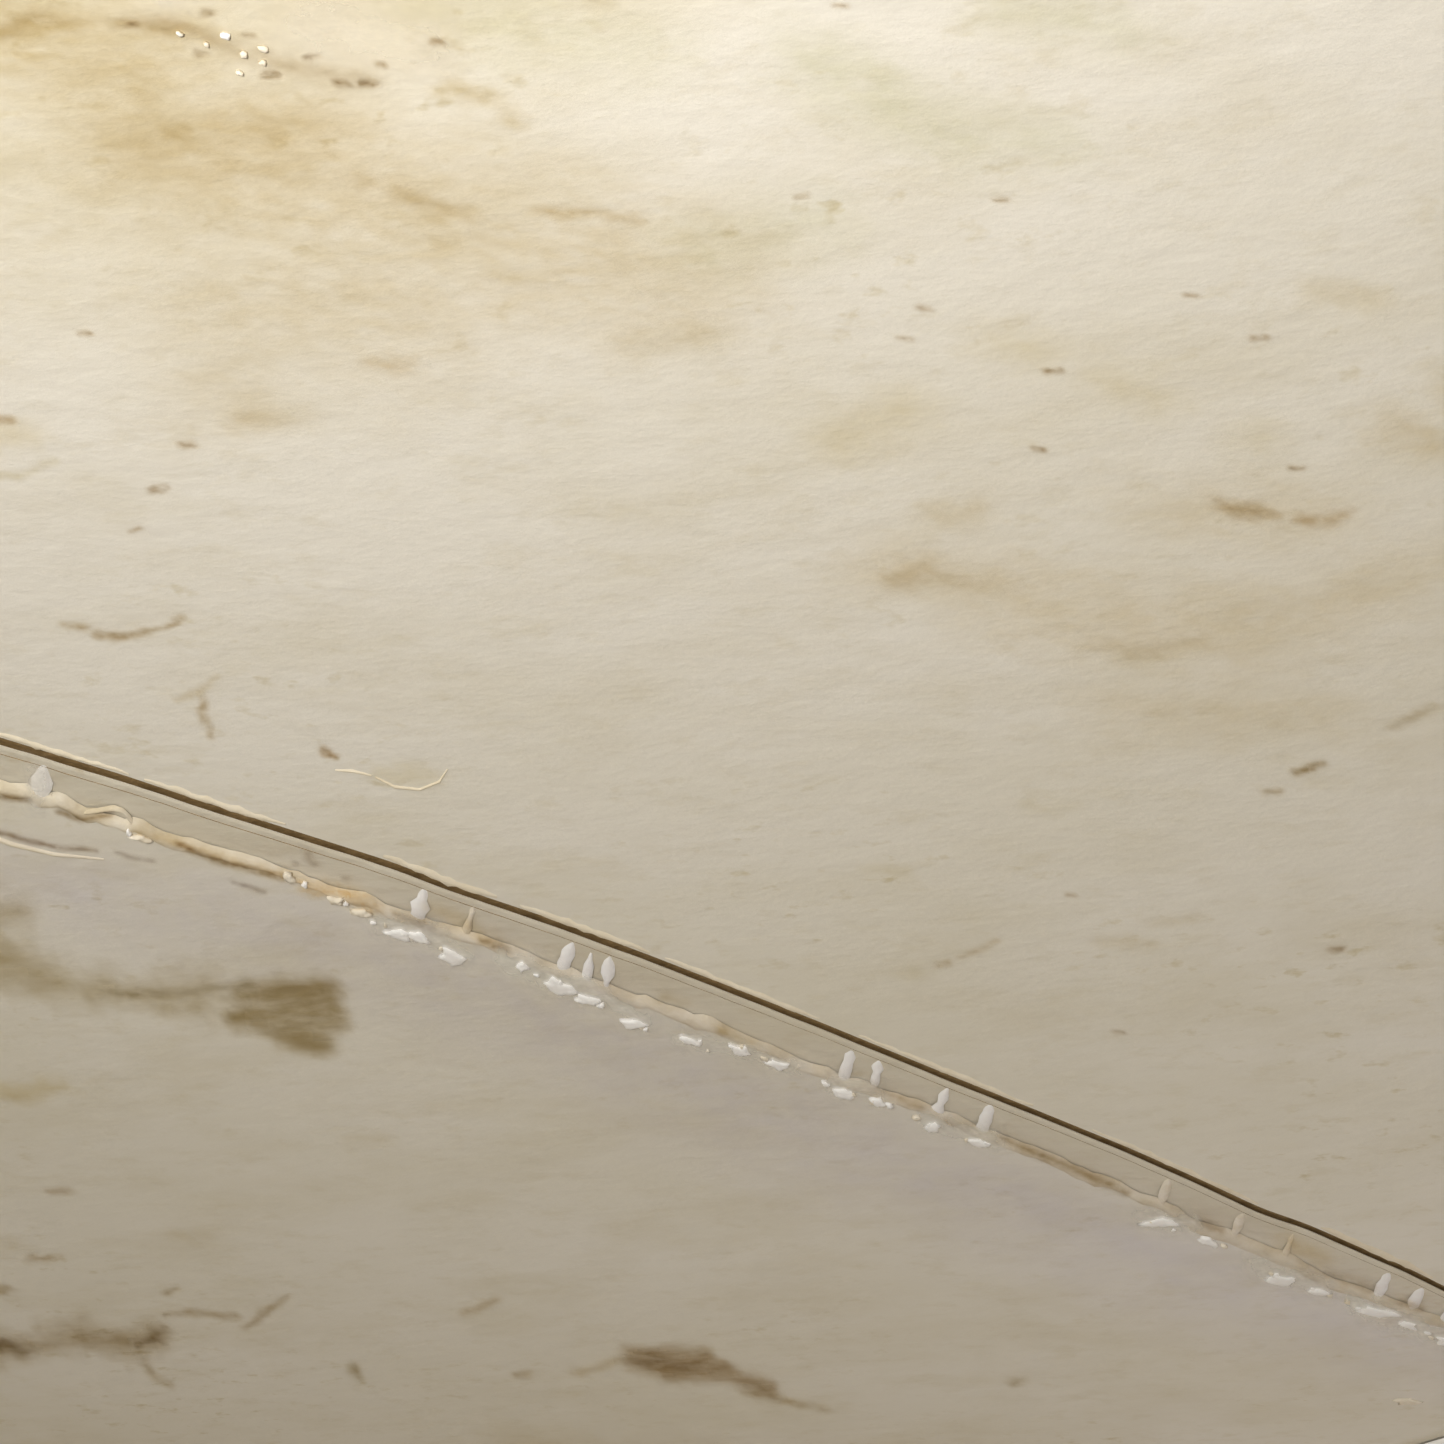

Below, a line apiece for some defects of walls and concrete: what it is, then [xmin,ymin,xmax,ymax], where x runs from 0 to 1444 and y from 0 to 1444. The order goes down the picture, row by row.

crack [0,733,1444,1346]